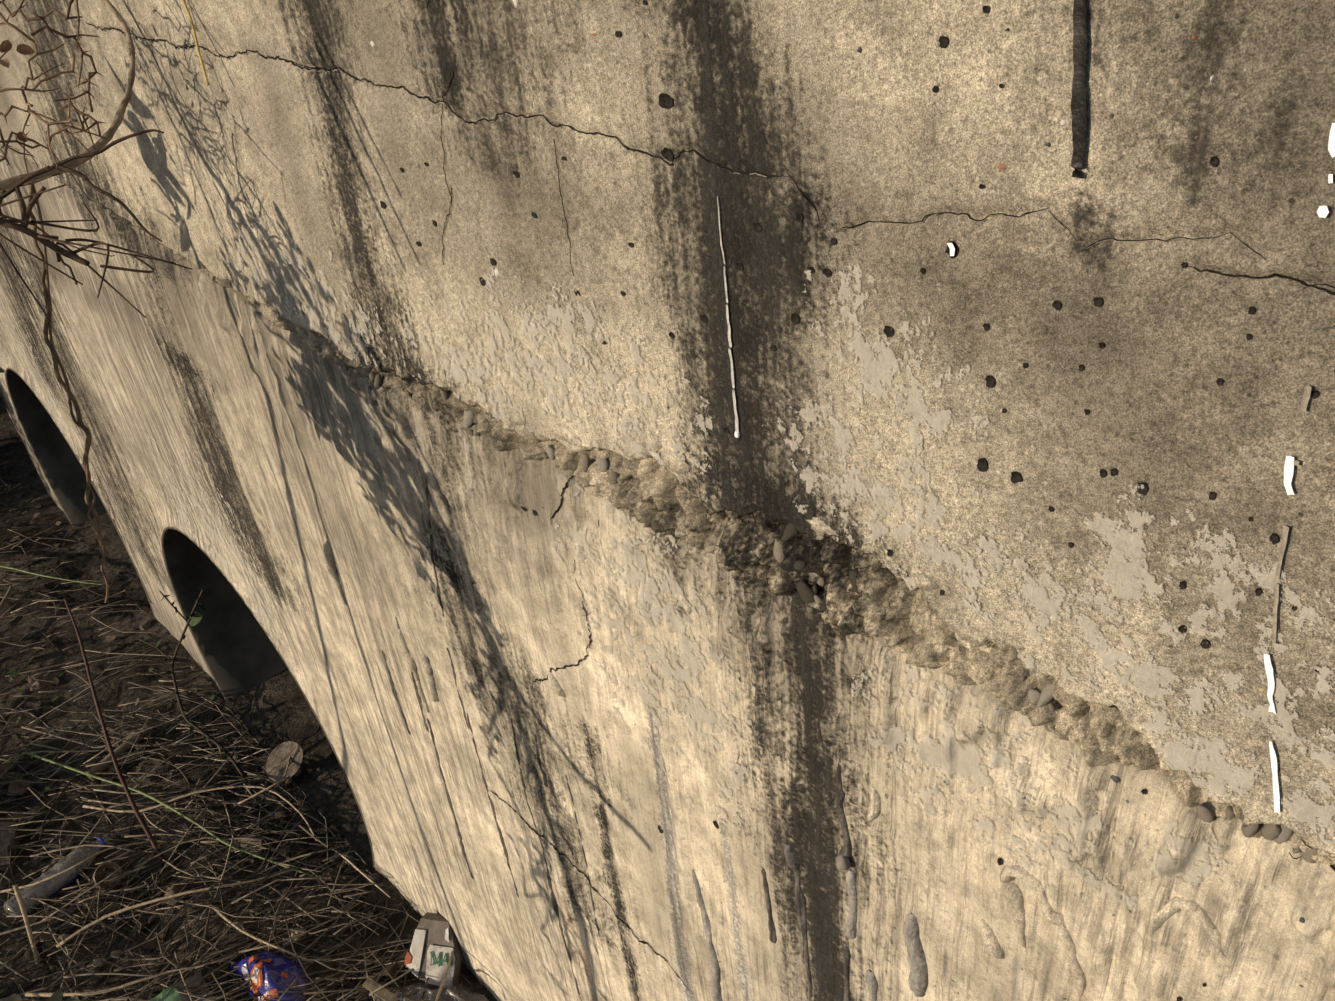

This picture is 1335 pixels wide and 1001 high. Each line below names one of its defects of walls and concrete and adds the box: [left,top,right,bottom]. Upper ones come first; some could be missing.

crack [85,22,1335,296]
water stain [276,0,640,1001]
crack [532,559,591,685]
water stain [622,476,695,618]
spalling [142,190,1335,930]
water stain [641,0,919,1001]
crack [490,790,692,992]